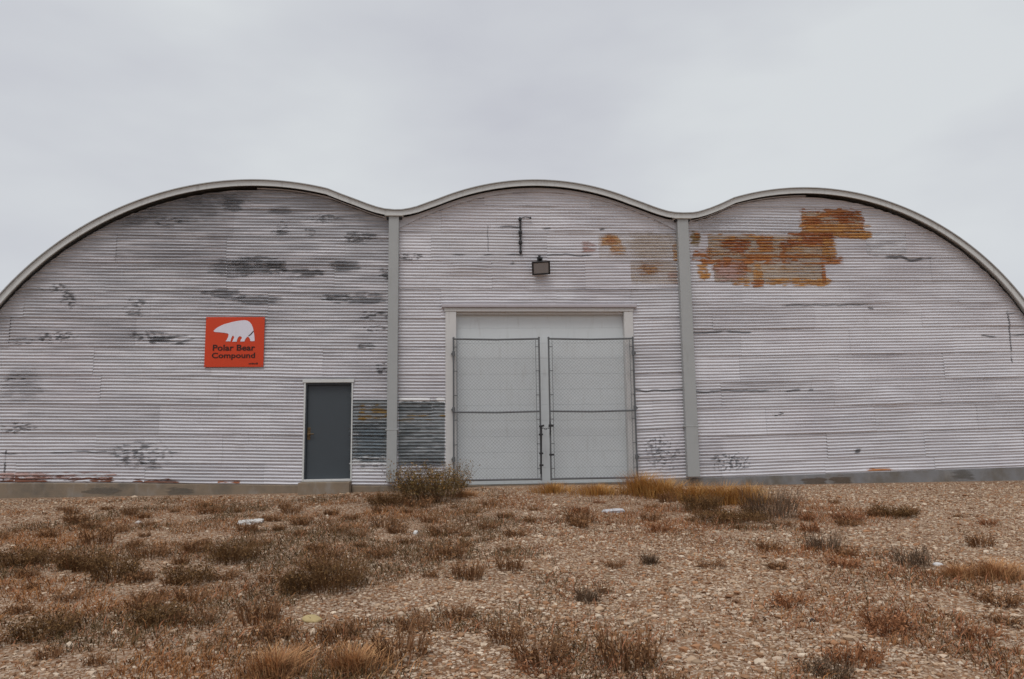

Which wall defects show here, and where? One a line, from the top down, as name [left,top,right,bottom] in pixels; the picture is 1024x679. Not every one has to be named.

corrosion [582,232,678,283]
corrosion [690,208,872,287]
peeling [202,289,277,305]
peeling [350,397,445,471]